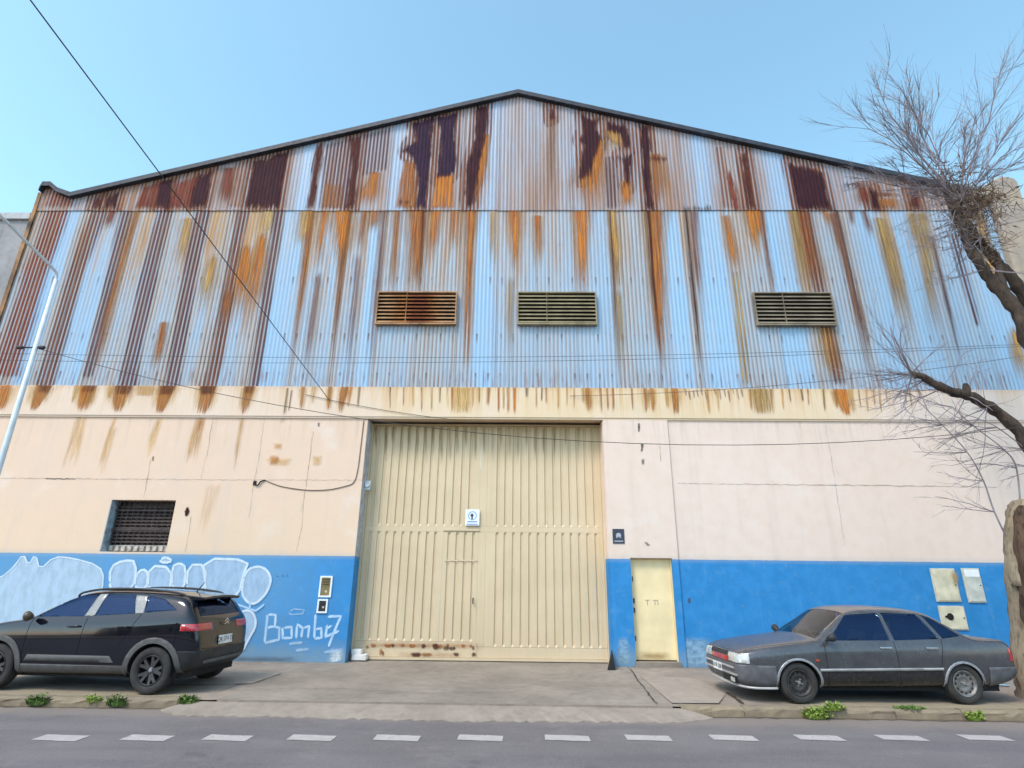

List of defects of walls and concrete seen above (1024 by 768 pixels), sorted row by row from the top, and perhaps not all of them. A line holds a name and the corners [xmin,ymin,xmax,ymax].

corrosion [0,149,293,447]
corrosion [328,387,360,411]
corrosion [390,387,542,411]
corrosion [573,110,667,352]
corrosion [684,210,699,343]
corrosion [631,273,809,413]
corrosion [716,145,768,258]
corrosion [781,155,865,326]
corrosion [822,327,887,414]
corrosion [847,180,954,331]
corrosion [952,233,978,325]
corrosion [367,644,476,657]